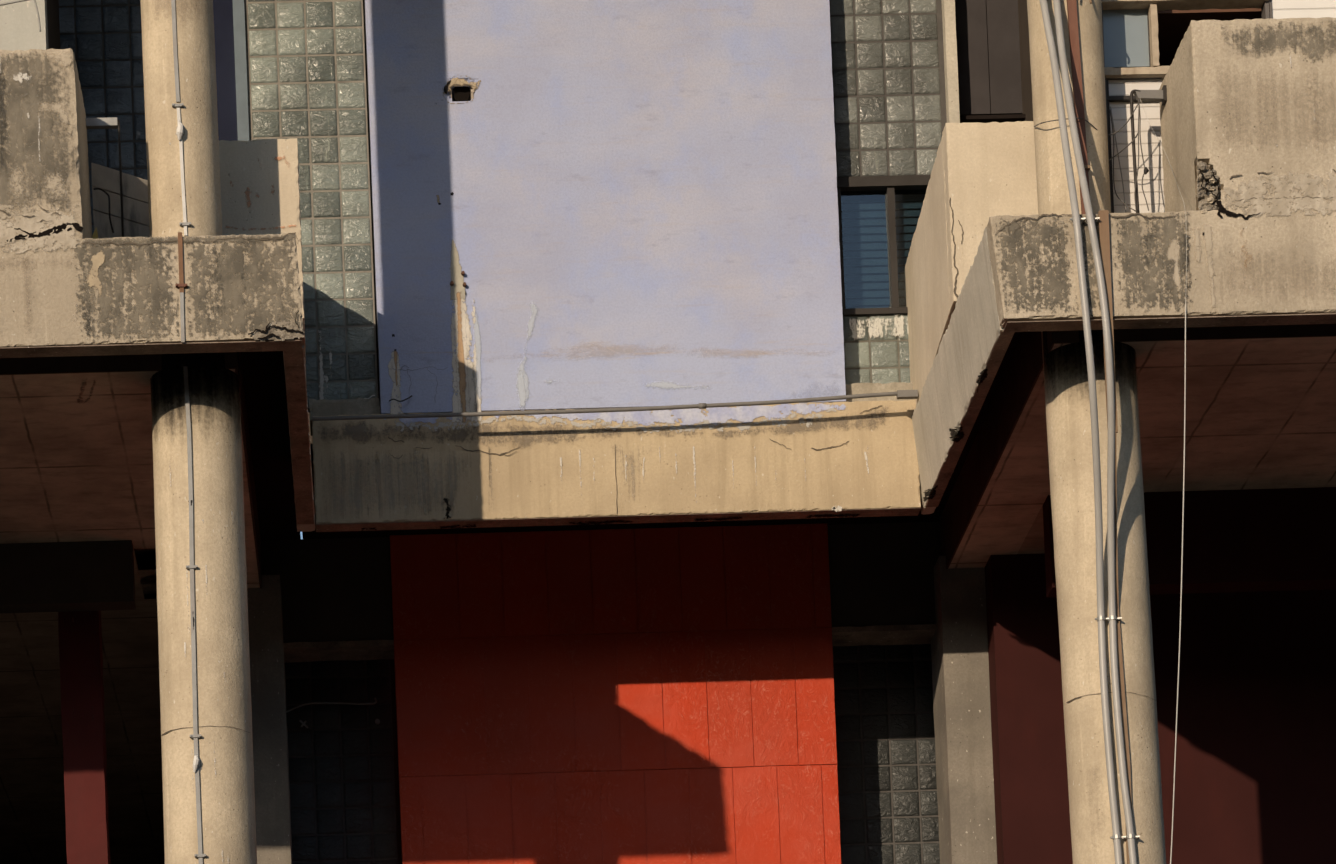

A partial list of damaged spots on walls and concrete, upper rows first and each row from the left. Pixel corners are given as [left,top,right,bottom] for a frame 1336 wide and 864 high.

water stain [0,52,76,211]
spalling [1197,161,1336,218]
crack [0,205,298,249]
water stain [73,234,300,341]
water stain [996,214,1191,313]
crack [248,310,304,340]
water stain [321,239,621,486]
peeling [384,402,847,433]
water stain [775,409,885,434]